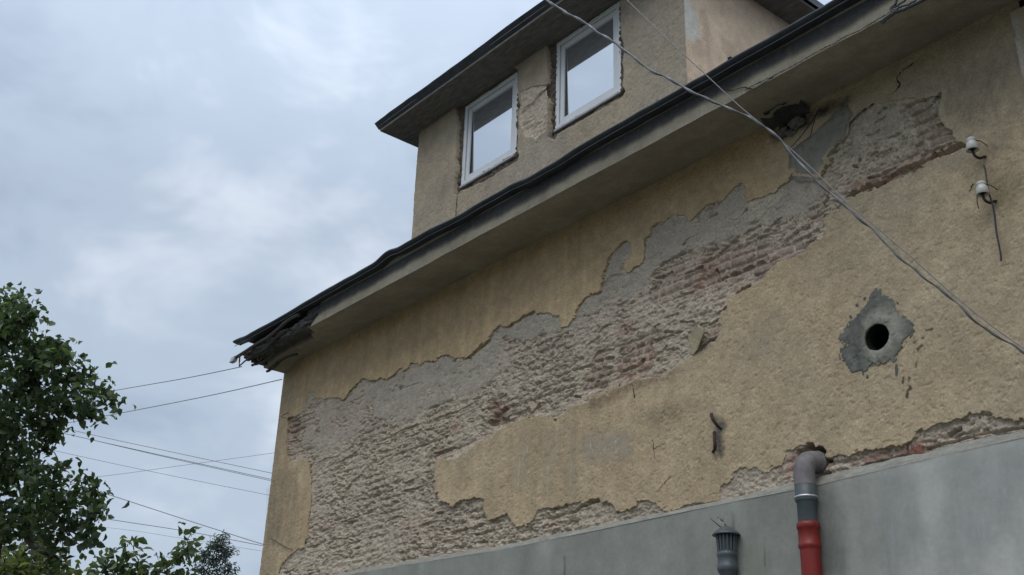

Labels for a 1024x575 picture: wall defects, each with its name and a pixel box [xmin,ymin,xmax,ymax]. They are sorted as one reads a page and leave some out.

spalling [457,6,625,195]
spalling [229,313,316,373]
spalling [279,97,966,575]
spalling [720,412,1024,500]